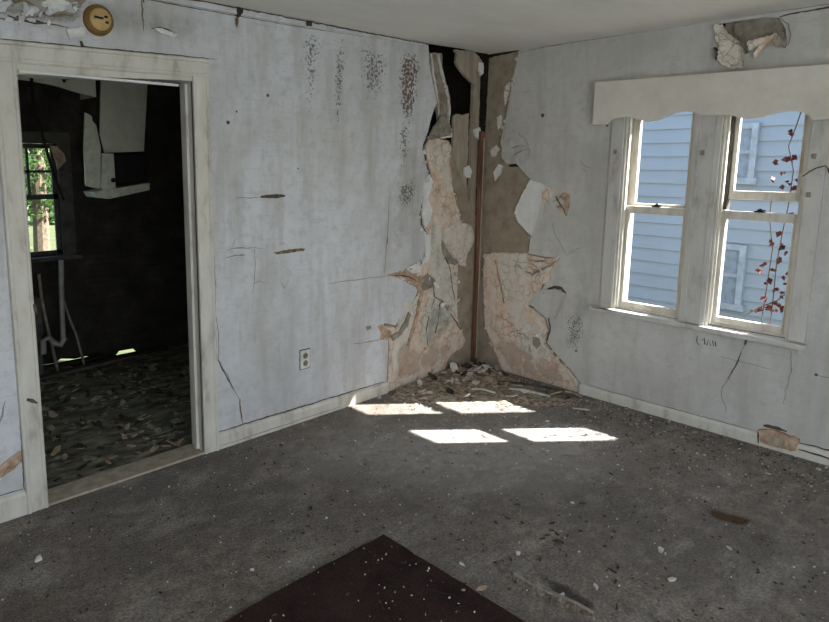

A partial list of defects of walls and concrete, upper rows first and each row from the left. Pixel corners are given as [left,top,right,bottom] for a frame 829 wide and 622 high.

peeling [0,0,86,47]
flaking render [713,9,792,69]
water stain [361,50,386,99]
mould [398,52,419,166]
flaking render [366,49,581,392]
crack [216,318,243,423]
crack [721,340,792,410]
peeling [0,451,22,480]
peeling [757,424,829,460]